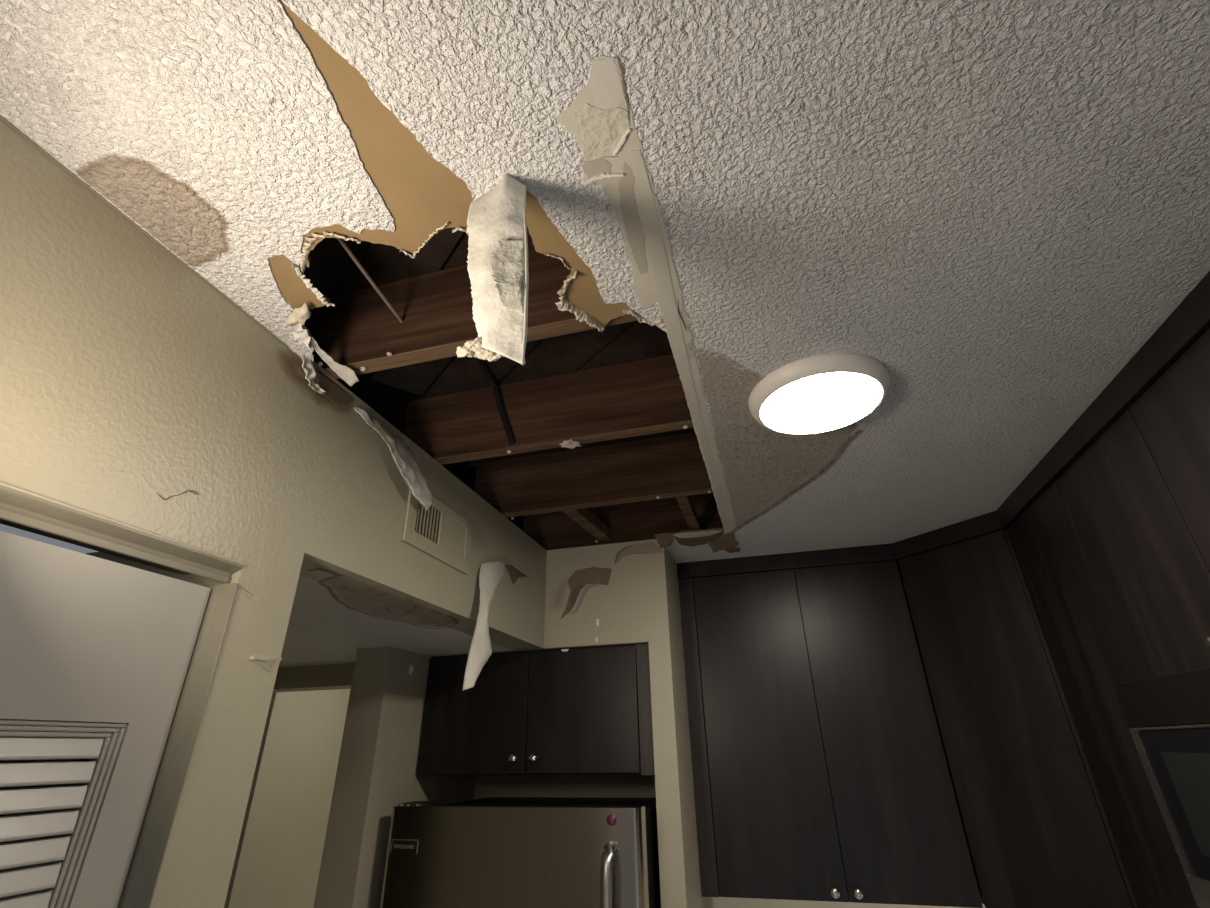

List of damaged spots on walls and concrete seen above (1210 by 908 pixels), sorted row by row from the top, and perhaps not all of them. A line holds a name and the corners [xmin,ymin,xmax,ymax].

water stain [77,156,229,266]
peeling [490,238,525,313]
peeling [556,55,738,529]
peeling [354,407,432,510]
peeling [560,542,662,619]